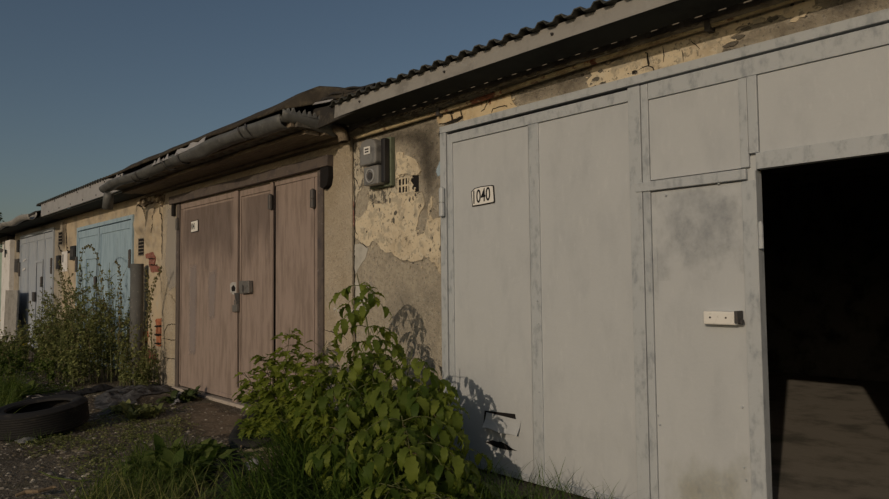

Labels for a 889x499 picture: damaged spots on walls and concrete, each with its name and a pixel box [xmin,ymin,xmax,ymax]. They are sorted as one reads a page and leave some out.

peeling [581,0,822,87]
water stain [401,132,434,183]
crack [136,204,163,252]
peeling [353,145,441,314]
flaking render [145,252,161,272]